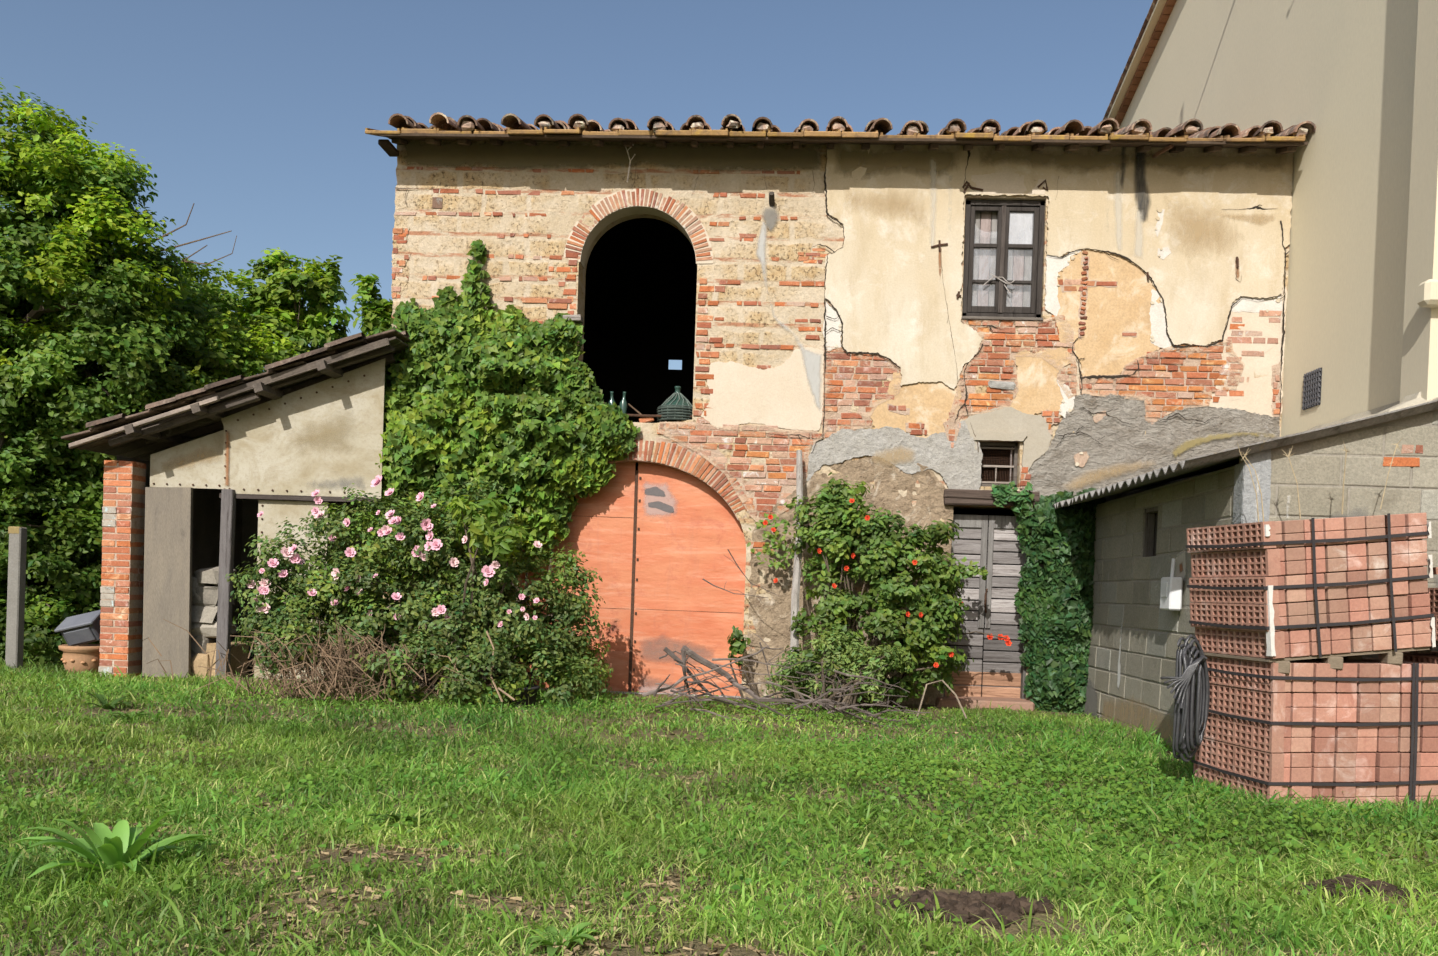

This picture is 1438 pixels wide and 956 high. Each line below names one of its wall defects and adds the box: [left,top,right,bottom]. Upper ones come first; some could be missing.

damp [984,147,1282,256]
spalling [657,250,1283,522]
spalling [750,542,774,557]